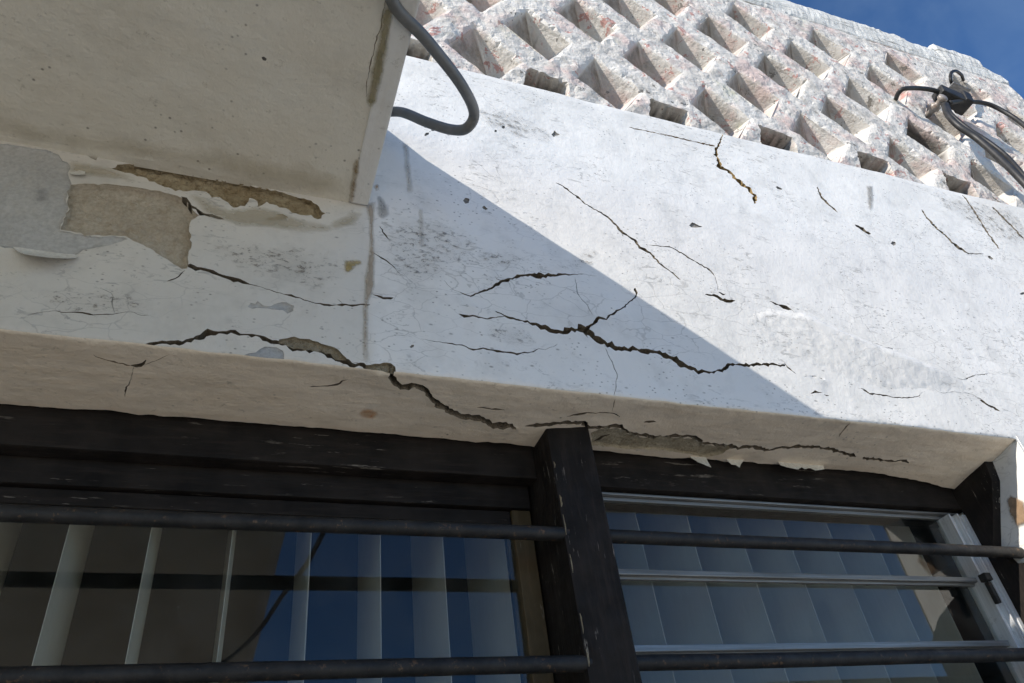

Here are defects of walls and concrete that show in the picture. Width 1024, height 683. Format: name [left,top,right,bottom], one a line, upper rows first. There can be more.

crack [630,127,757,204]
peeling [0,144,325,269]
crack [168,227,401,307]
crack [557,183,735,303]
crack [817,187,871,234]
crack [922,195,1024,254]
crack [94,272,909,463]
peeling [778,462,824,471]